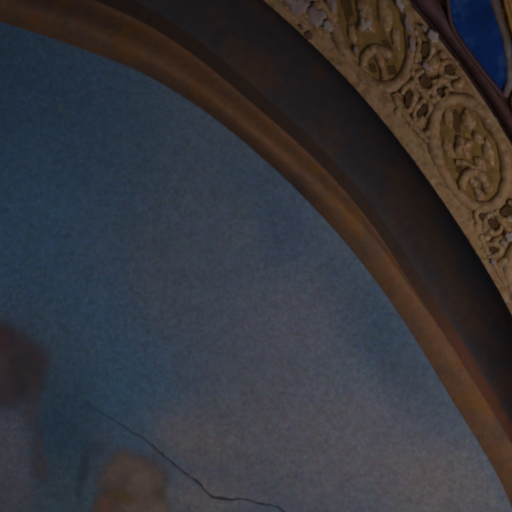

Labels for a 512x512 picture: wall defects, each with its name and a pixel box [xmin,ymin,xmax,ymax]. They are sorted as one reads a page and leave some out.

crack [87,404,288,512]